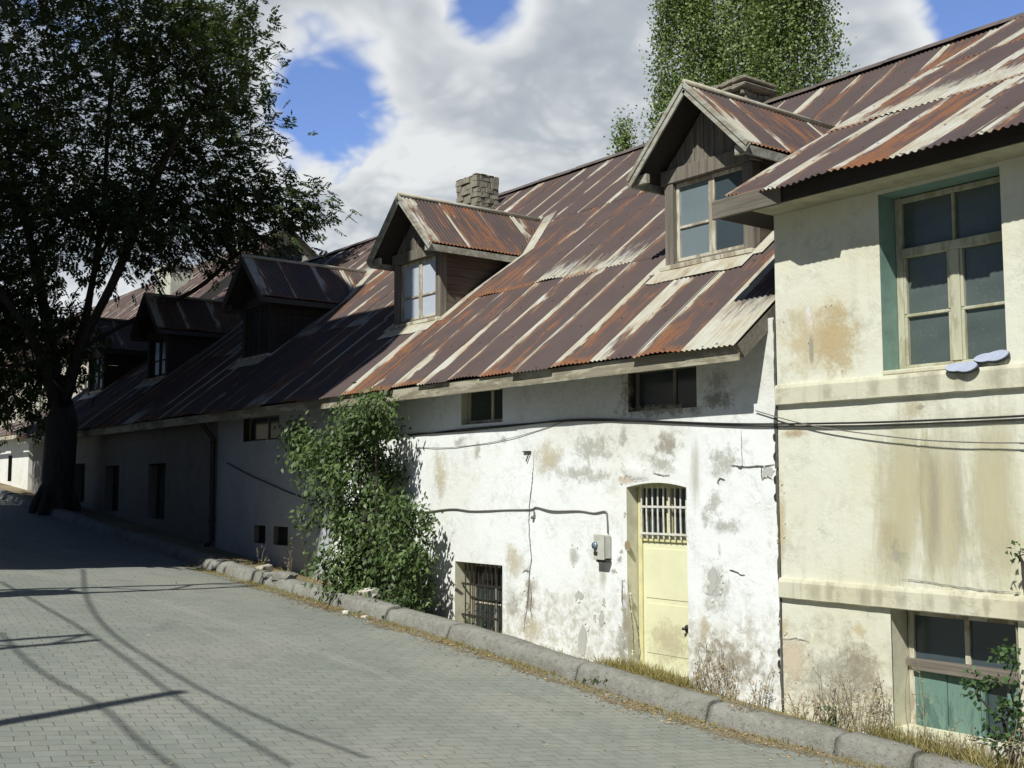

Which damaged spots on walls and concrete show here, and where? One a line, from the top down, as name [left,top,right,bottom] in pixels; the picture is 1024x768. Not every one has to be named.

water stain [881,438,959,566]
water stain [975,438,1010,563]
spalling [705,567,724,602]